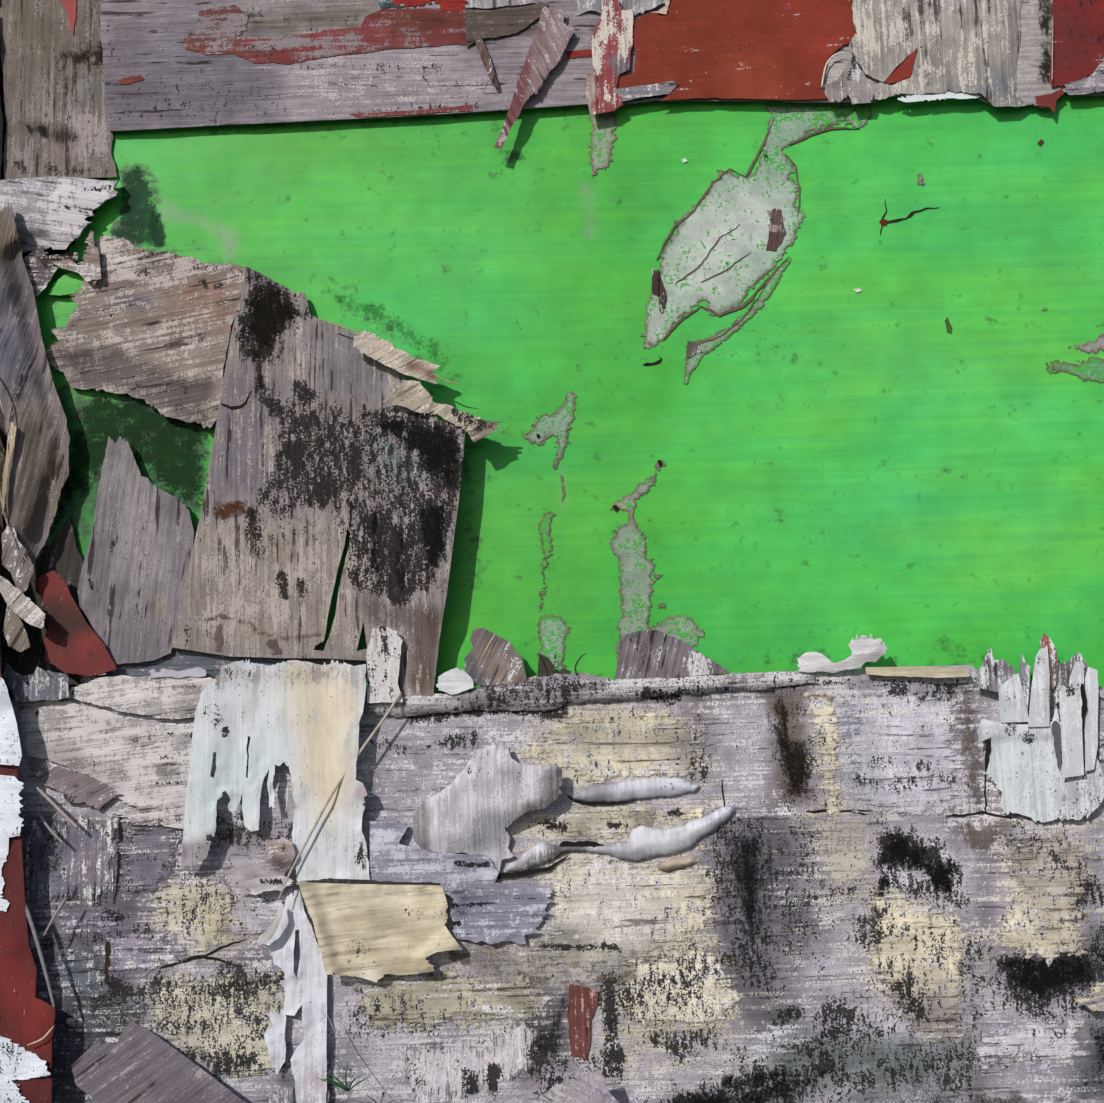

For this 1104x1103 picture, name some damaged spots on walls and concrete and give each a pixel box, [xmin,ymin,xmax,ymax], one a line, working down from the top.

peeling [184,0,472,64]
peeling [897,91,983,102]
peeling [641,54,875,384]
damp [246,287,299,388]
damp [370,417,461,486]
peeling [522,392,577,501]
peeling [537,508,572,674]
peeling [609,460,705,664]
damp [871,832,957,914]
damp [960,823,1001,851]
damp [1001,954,1104,999]
damp [687,1067,824,1103]